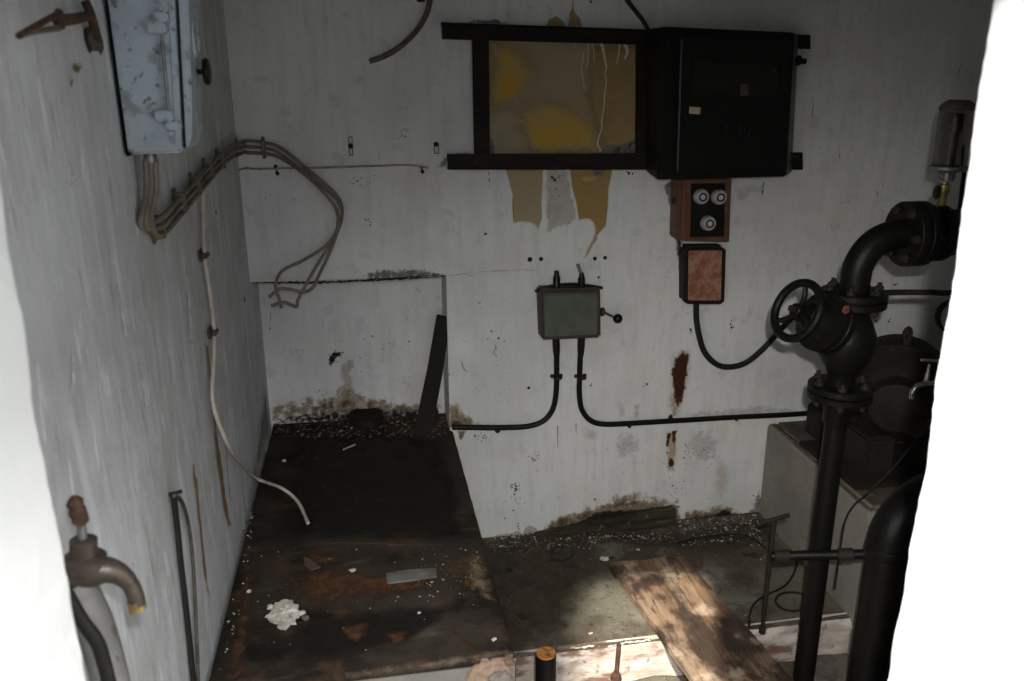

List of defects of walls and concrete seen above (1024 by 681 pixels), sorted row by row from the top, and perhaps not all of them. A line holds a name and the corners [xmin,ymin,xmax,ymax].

peeling [506,170,612,261]
crack [250,268,538,284]
damp [258,335,419,464]
rust [671,351,689,416]
rust [193,467,208,589]
rust [213,415,231,525]
damp [495,493,736,537]
rust [663,431,684,496]